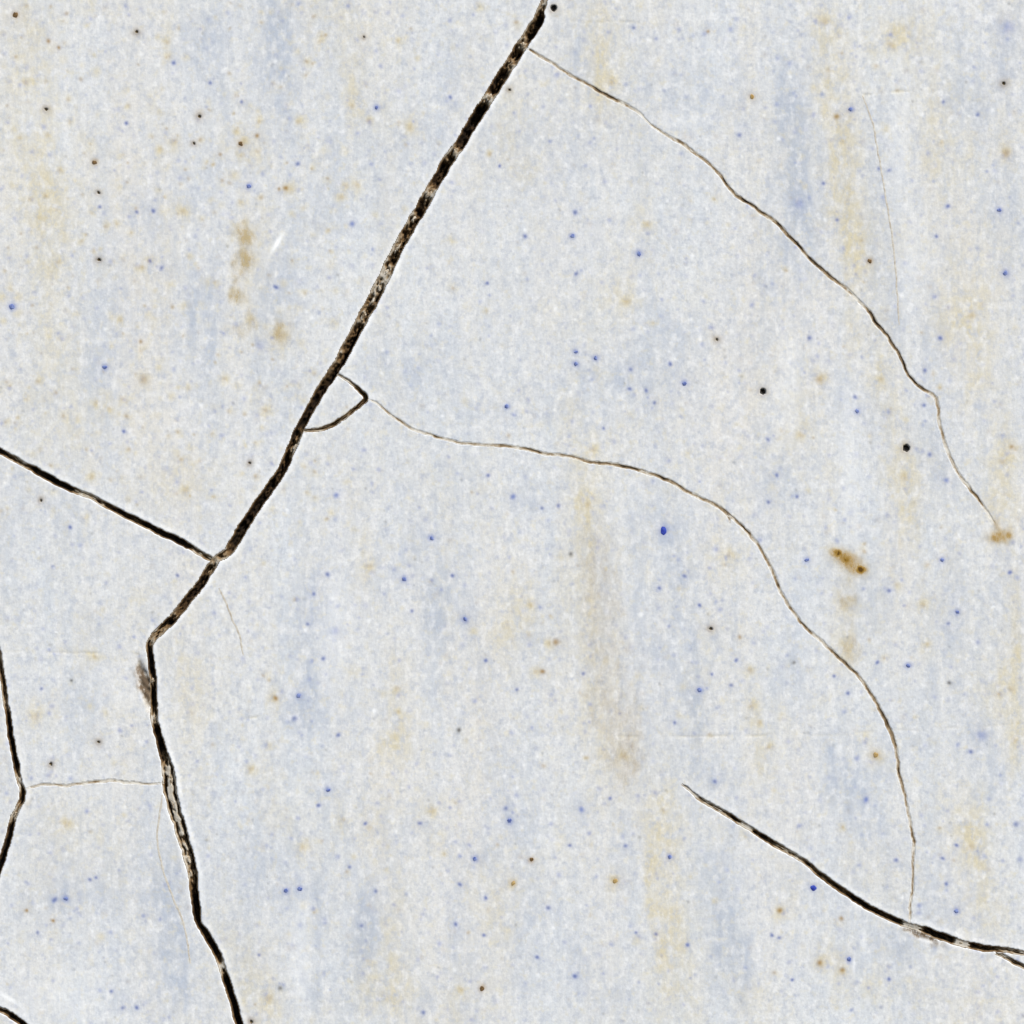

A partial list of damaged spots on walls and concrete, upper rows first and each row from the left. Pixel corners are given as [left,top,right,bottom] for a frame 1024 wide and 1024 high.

crack [0,0,548,1024]
crack [368,398,916,921]
crack [527,47,996,524]
corrosion [833,549,867,574]
crack [681,783,1024,969]